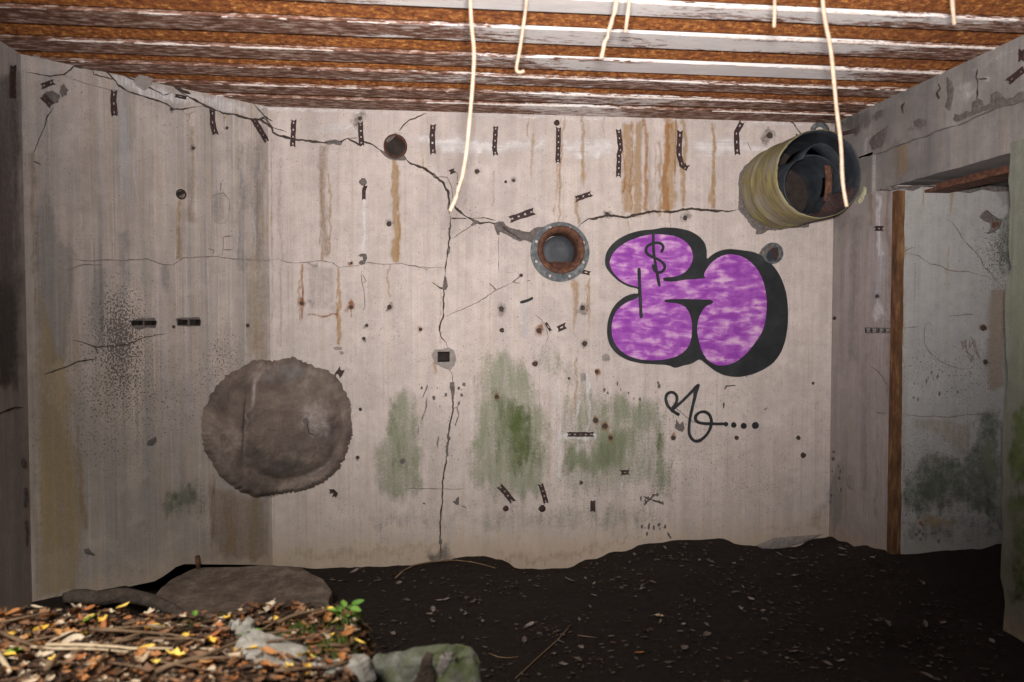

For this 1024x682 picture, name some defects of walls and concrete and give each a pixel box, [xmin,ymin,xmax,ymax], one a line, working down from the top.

crack [33,107,54,164]
crack [29,65,380,150]
corrosion [392,160,401,263]
corrosion [623,119,686,214]
crack [69,159,513,552]
leakage [905,414,998,525]